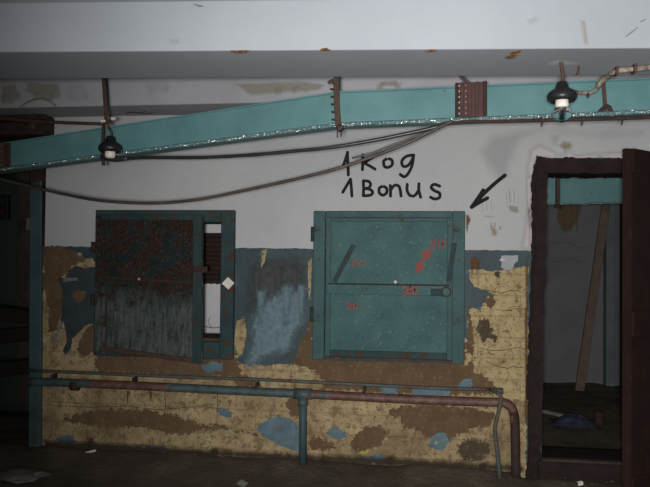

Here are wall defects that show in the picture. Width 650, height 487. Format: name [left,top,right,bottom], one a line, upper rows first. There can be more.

peeling [42,245,529,478]
crack [479,286,530,377]